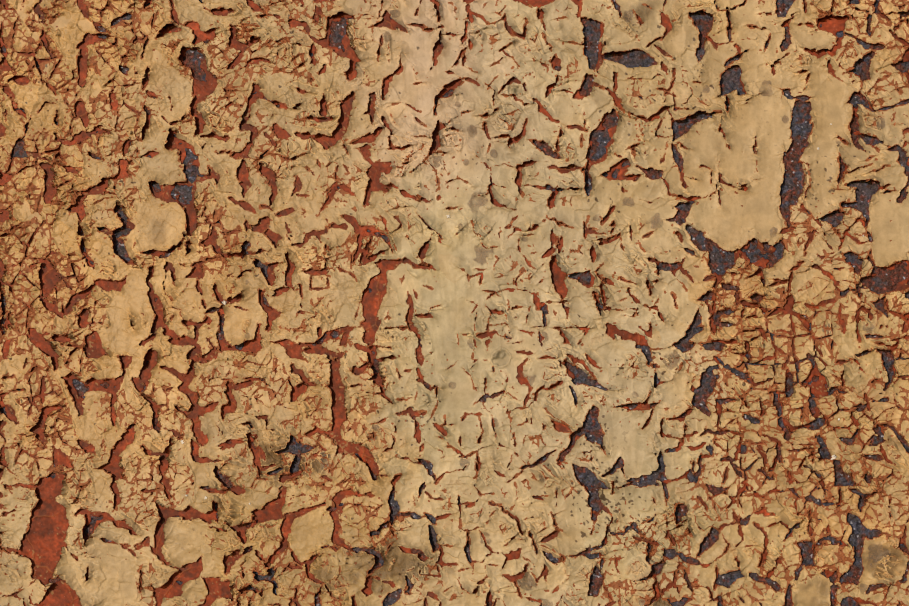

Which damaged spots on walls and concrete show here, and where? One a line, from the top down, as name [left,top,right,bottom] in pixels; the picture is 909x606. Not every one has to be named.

crack [0,0,197,556]
peeling [0,150,303,606]
peeling [140,64,211,186]
corrosion [140,21,272,220]
peeling [282,207,448,485]
peeling [534,319,676,505]
crack [337,0,909,606]
corrosion [526,103,723,204]
peeling [508,0,909,268]
corrosion [660,100,816,292]
corrosion [840,245,909,298]
crack [65,537,94,584]